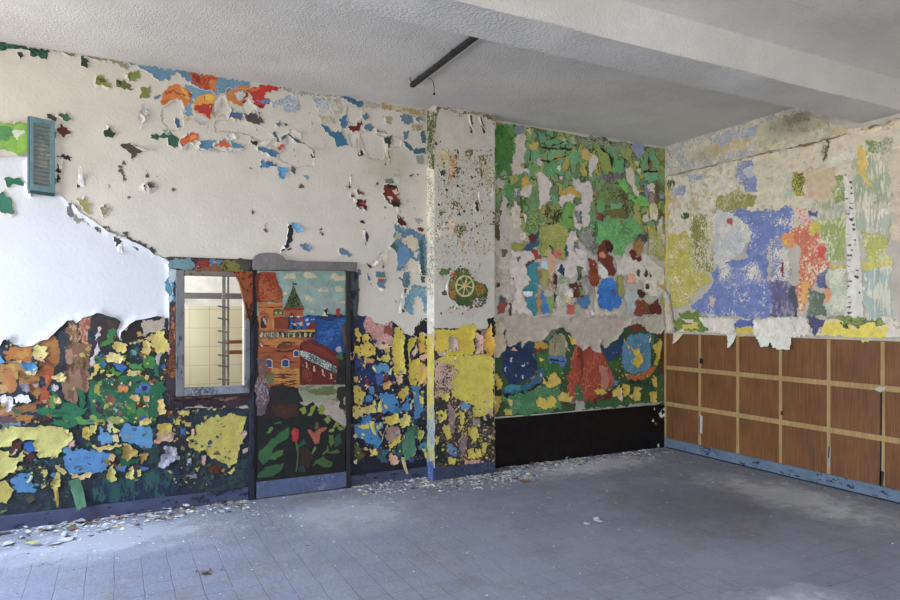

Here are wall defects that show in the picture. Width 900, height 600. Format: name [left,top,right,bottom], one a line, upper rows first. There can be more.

crack [666,118,900,177]
peeling [0,41,683,513]
peeling [699,307,736,348]
peeling [753,307,810,350]